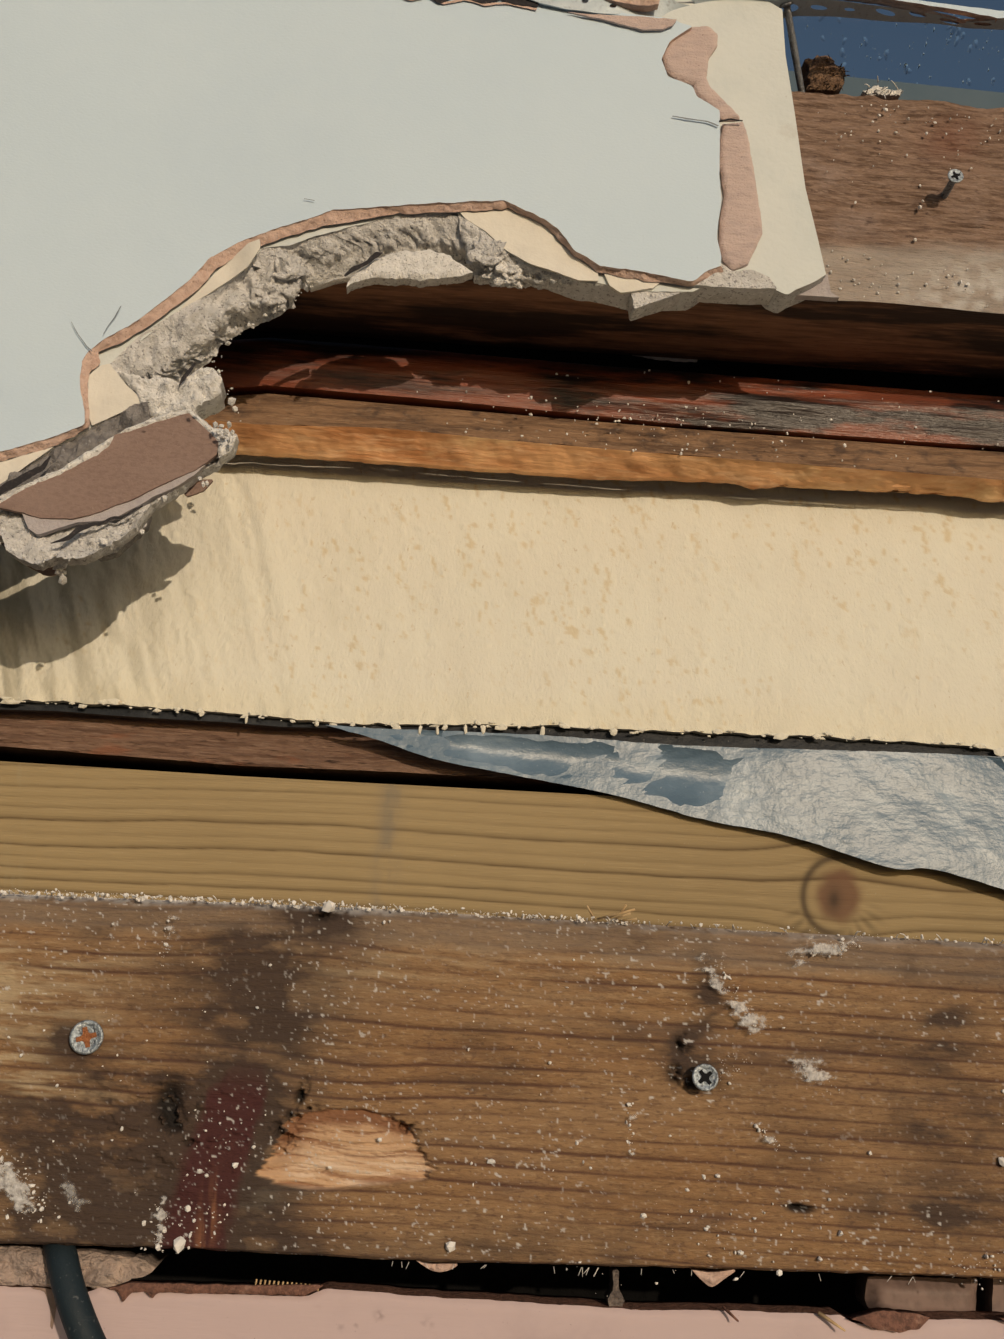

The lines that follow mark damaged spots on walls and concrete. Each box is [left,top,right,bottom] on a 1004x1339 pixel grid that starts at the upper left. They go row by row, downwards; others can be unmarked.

crack [409,0,539,10]
spalling [844,0,991,26]
spalling [0,0,777,485]